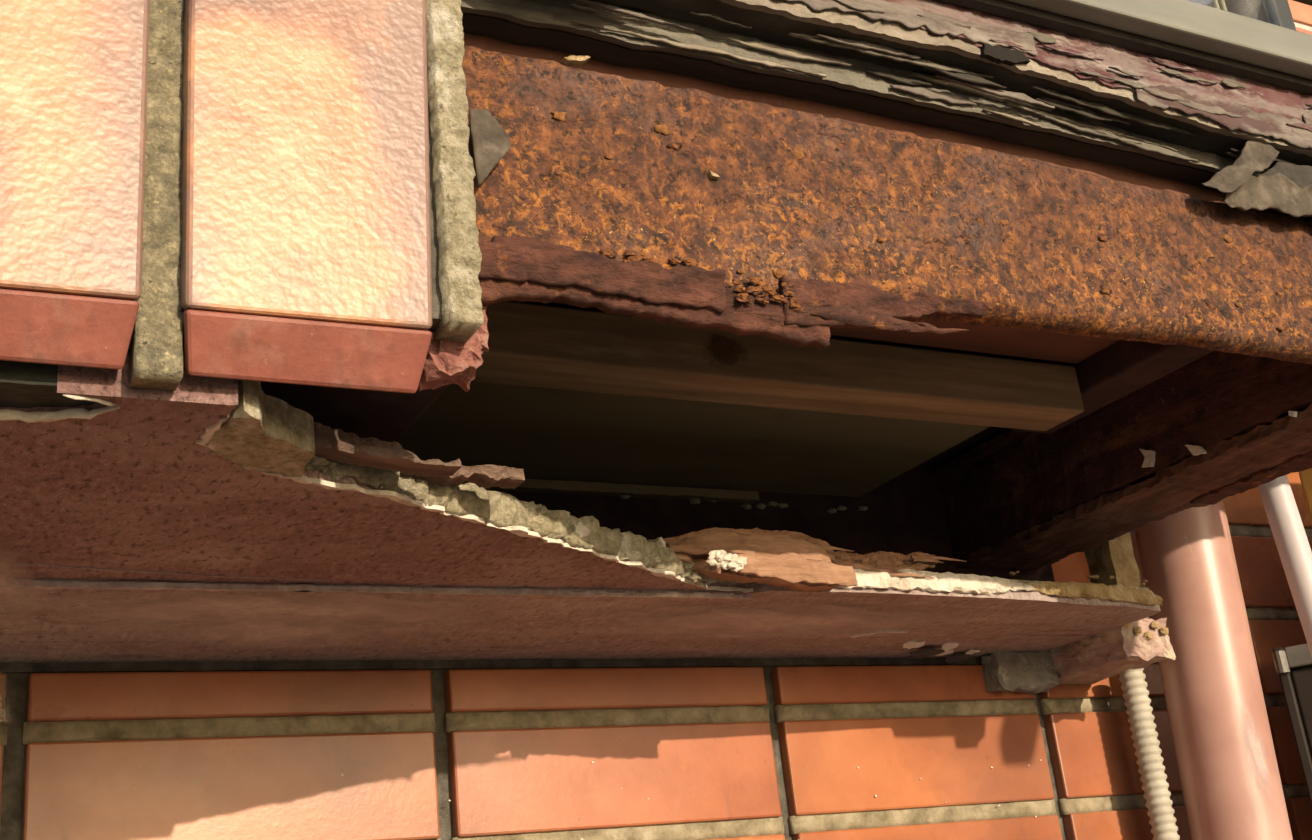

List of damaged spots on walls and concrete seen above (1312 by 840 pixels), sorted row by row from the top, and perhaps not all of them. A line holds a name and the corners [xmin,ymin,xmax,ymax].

spalling [418,0,511,392]
rust [654,122,683,152]
rust [478,236,989,350]
peeling [785,0,1312,218]
spalling [0,379,1176,694]
peeling [1190,450,1312,505]